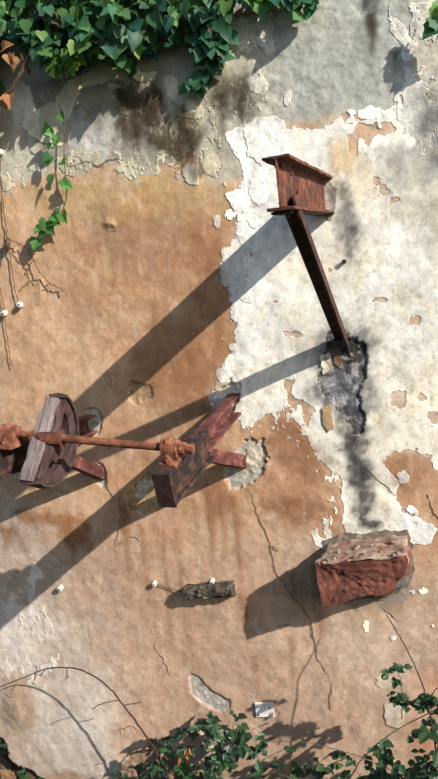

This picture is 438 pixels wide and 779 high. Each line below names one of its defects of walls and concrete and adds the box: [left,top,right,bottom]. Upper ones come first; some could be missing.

leakage [116,82,201,165]
peeling [0,162,42,192]
peeling [9,0,438,550]
leakage [315,384,347,422]
leakage [340,430,382,529]
crack [249,491,333,712]
flaking render [189,674,231,712]